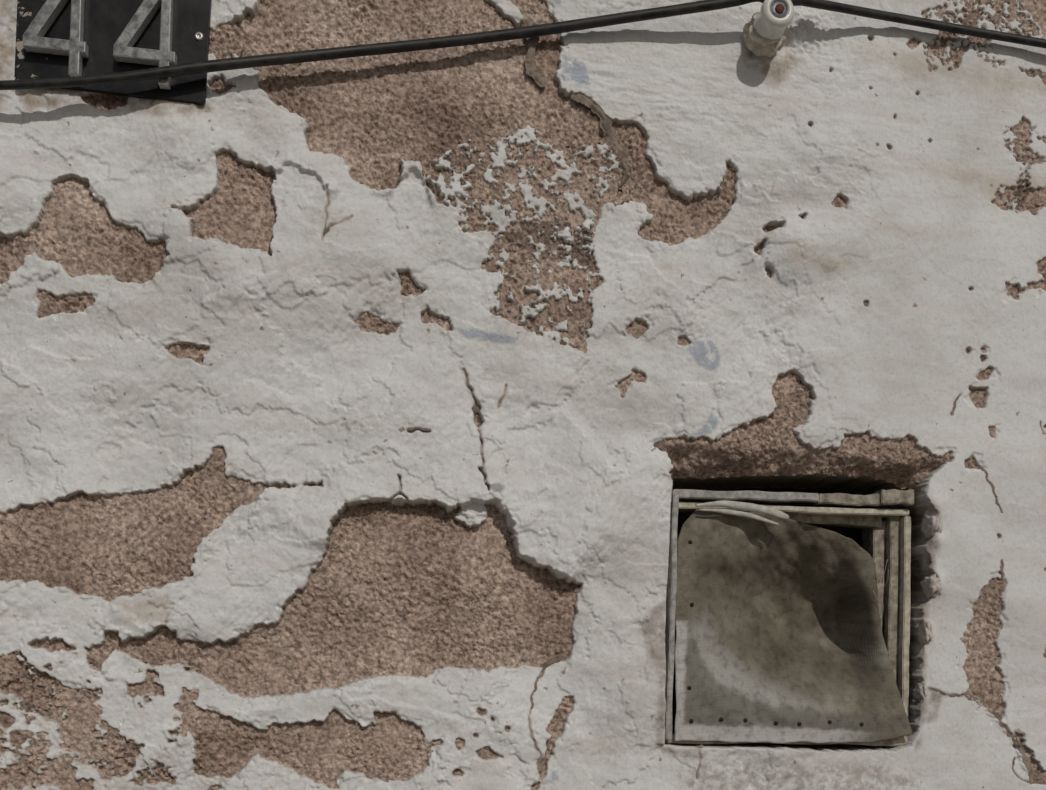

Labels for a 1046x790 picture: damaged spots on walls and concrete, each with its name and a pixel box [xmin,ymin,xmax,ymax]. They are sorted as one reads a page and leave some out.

spalling [907,0,1046,72]
spalling [1019,68,1046,85]
spalling [183,0,736,353]
spalling [991,118,1046,215]
spalling [0,178,168,284]
spalling [1005,258,1046,300]
crack [463,370,500,428]
spalling [654,372,980,490]
spalling [0,398,581,790]
spalling [963,578,1006,716]
crack [528,654,563,771]
spalling [1017,734,1046,784]